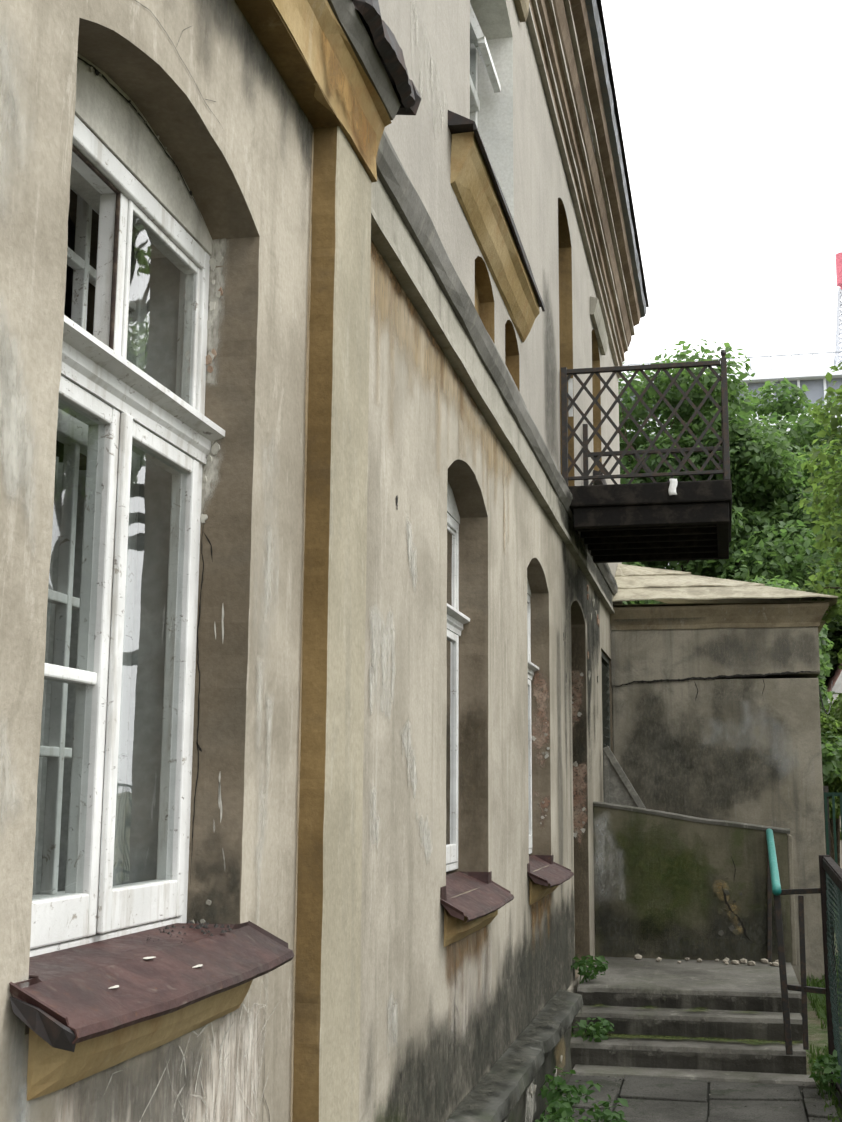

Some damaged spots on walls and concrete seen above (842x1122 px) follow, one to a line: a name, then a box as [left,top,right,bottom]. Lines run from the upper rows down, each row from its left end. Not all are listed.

peeling [206,239,226,383]
crack [190,513,213,883]
peeling [532,671,550,765]
peeling [566,670,584,729]
crack [615,671,816,700]
peeling [573,761,588,844]
water stain [385,809,778,1122]
water stain [93,1052,200,1122]